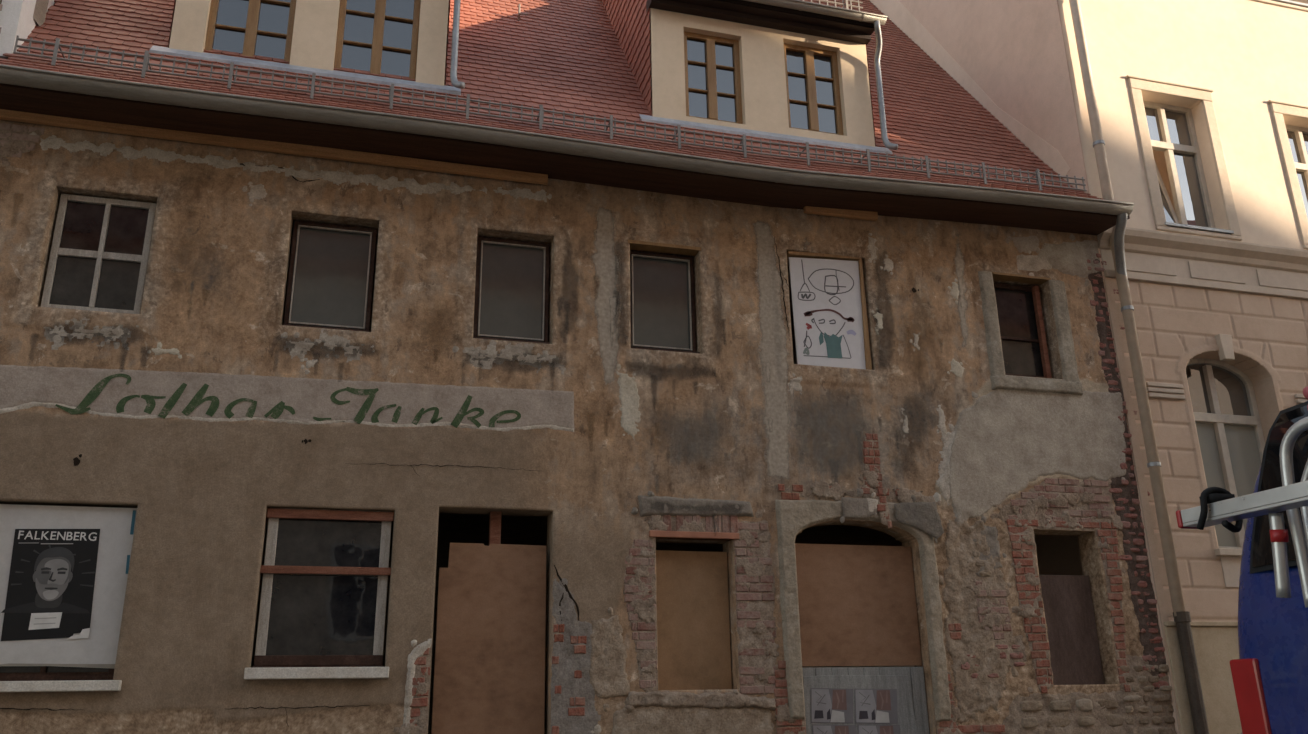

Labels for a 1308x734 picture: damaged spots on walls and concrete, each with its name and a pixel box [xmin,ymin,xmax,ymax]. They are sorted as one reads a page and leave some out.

peeling [867,233,893,275]
peeling [872,307,883,335]
flaking render [778,405,955,528]
flaking render [933,232,1177,734]
flaking render [392,638,432,734]
spalling [551,578,601,734]
flaking render [623,510,806,734]